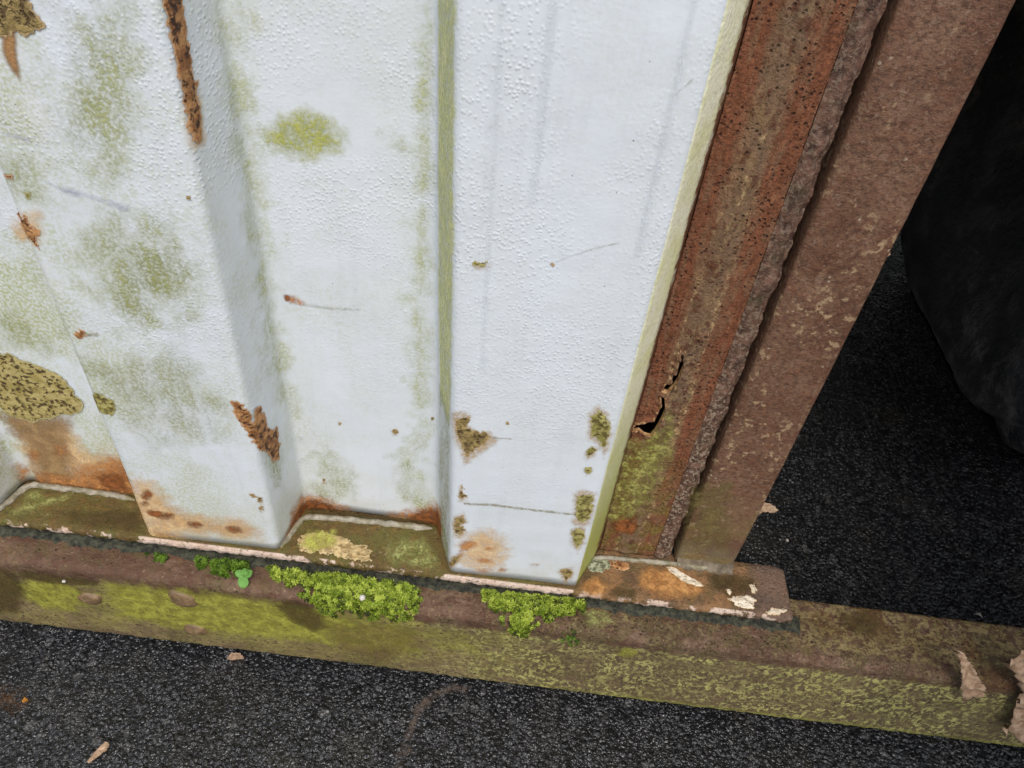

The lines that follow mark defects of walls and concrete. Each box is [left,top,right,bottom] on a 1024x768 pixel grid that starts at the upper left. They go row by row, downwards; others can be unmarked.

rust [163,0,203,145]
rust [0,352,251,538]
crack [632,348,695,445]